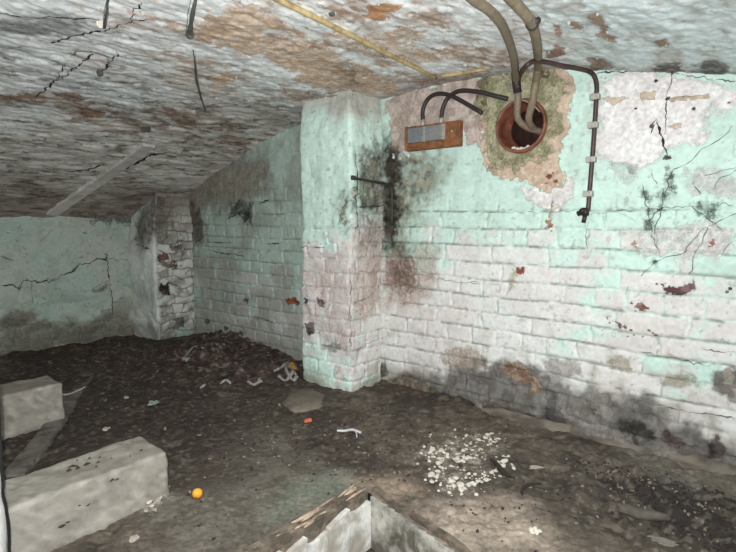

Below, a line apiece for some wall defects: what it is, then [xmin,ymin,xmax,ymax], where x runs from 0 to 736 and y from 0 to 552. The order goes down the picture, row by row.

crack [0,3,147,98]
flaking render [194,4,576,212]
peeling [587,58,736,182]
crack [649,72,735,160]
crack [2,244,149,318]
spalling [159,282,172,295]
spalling [158,243,185,270]
leakage [188,155,269,243]
leakage [340,143,411,285]
peeling [682,168,736,198]
leakage [388,346,736,466]